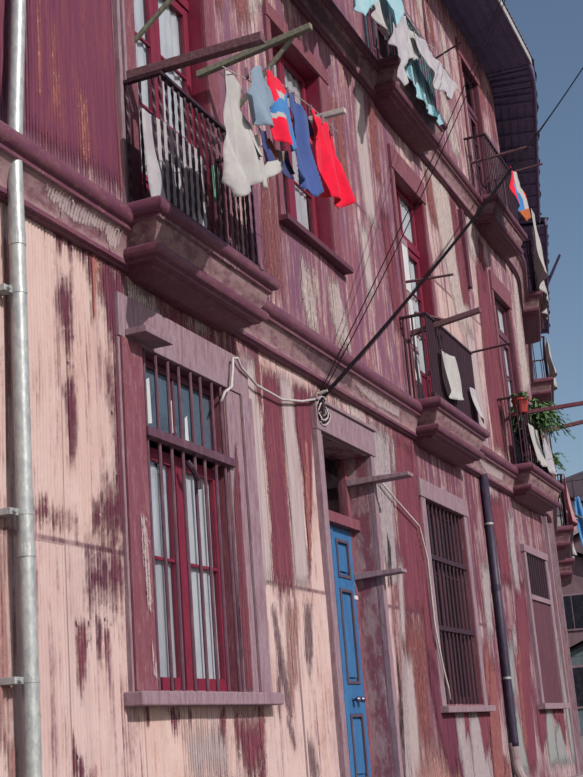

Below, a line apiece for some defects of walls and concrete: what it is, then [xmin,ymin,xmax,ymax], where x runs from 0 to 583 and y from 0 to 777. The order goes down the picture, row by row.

rust [254,359,298,716]
rust [393,437,510,777]
rust [490,494,575,777]